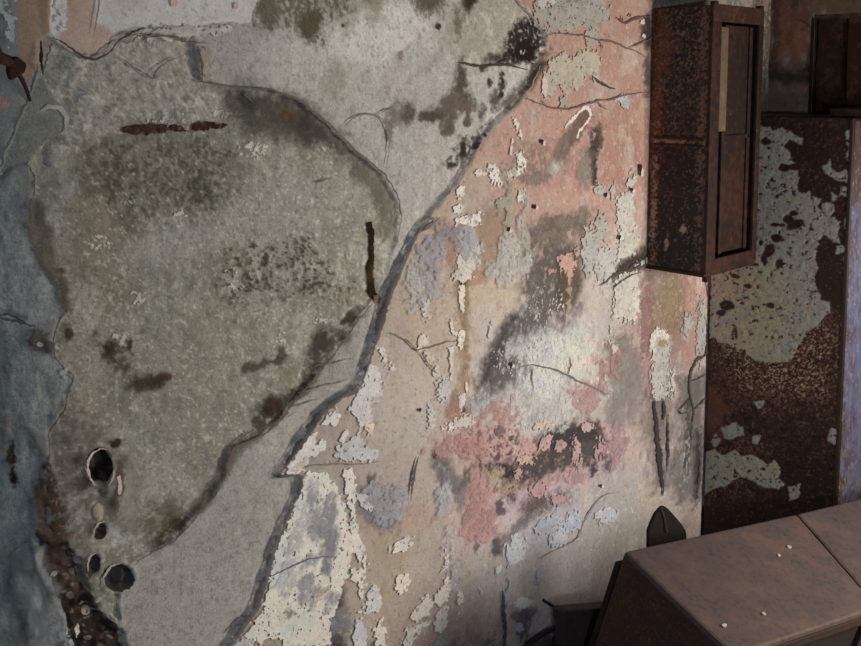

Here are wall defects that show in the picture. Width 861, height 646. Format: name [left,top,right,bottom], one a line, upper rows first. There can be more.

crack [458,58,528,70]
crack [527,77,651,110]
crack [548,13,653,58]
leakage [216,234,353,299]
leakage [529,209,595,310]
crack [39,27,455,646]
spalling [0,0,647,646]
leakage [446,209,506,420]
crack [653,284,710,496]
corrosion [33,463,74,545]
leakage [433,425,522,516]
leakage [547,428,595,445]